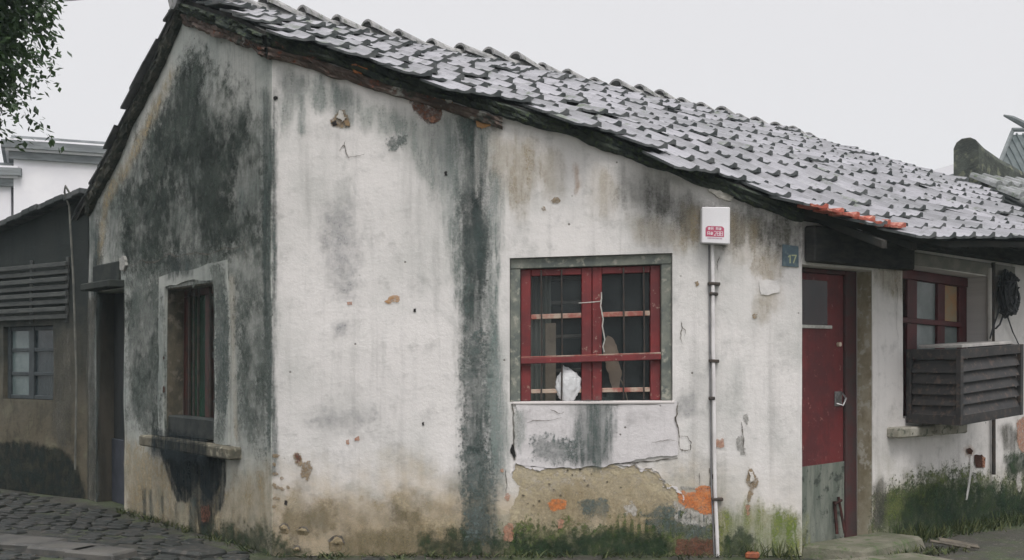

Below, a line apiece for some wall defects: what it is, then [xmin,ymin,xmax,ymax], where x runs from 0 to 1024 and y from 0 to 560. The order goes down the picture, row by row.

spalling [331,110,350,128]
spalling [410,97,453,124]
water stain [96,45,334,544]
water stain [342,110,524,555]
peeling [293,453,312,480]
crack [500,404,692,502]
peeling [503,463,716,556]
peeling [746,469,759,515]